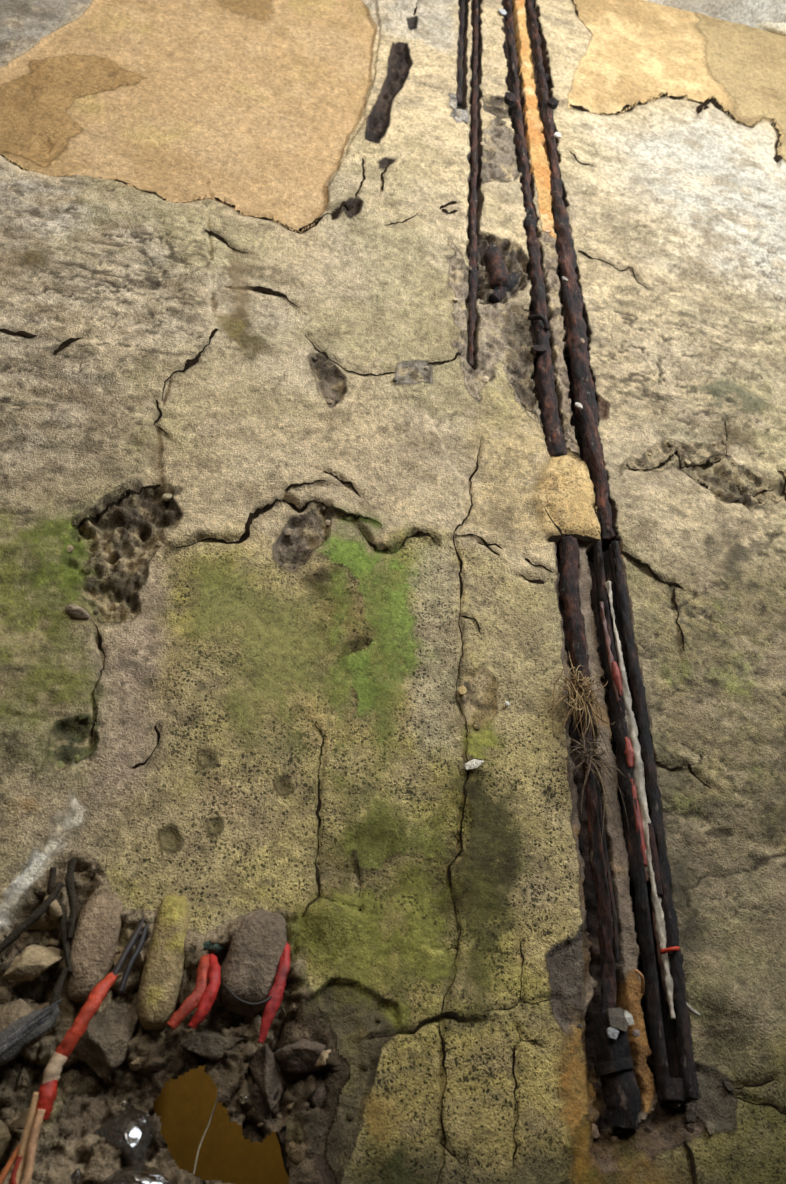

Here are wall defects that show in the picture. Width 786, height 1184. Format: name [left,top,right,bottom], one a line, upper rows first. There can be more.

peeling [0,0,418,233]
crack [570,92,783,162]
spalling [446,0,580,455]
crack [154,328,219,435]
spalling [620,433,786,510]
spalling [60,483,183,623]
crack [176,441,685,1184]
spalling [0,849,402,1184]
rust [561,1027,596,1174]